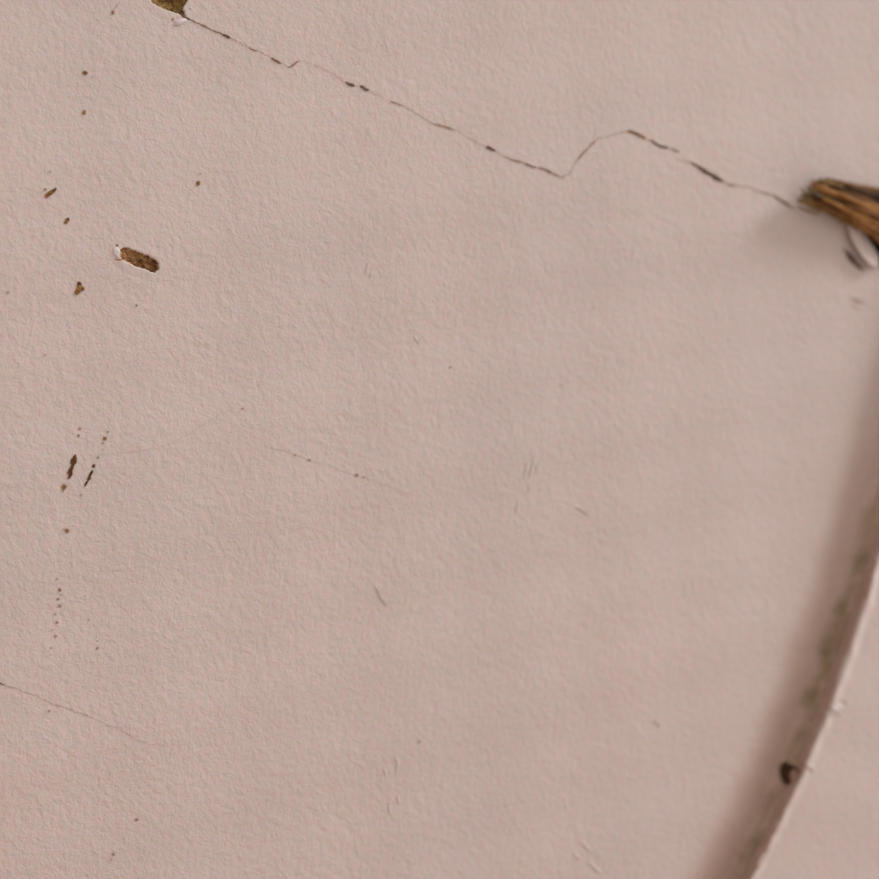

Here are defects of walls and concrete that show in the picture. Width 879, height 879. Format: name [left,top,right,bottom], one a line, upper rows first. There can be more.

flaking render [142,0,198,26]
crack [181,12,230,39]
crack [486,146,563,177]
crack [627,130,723,182]
flaking render [111,239,168,281]